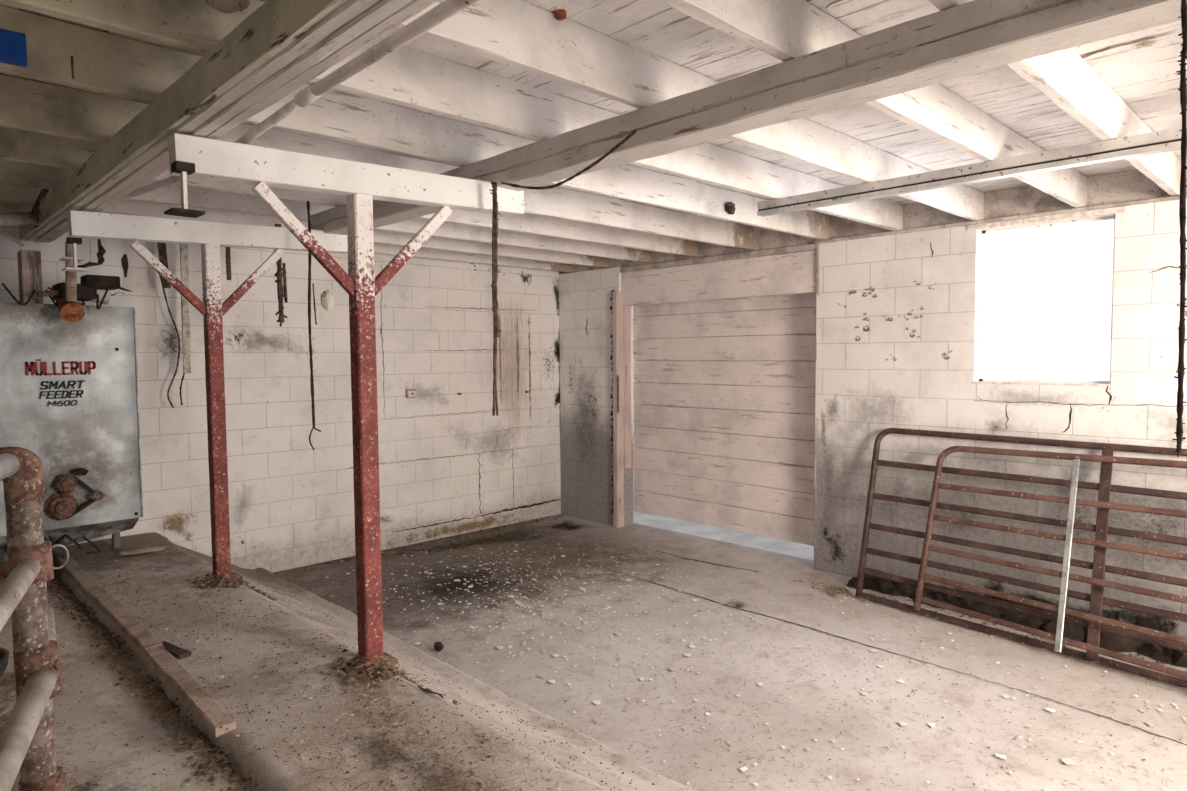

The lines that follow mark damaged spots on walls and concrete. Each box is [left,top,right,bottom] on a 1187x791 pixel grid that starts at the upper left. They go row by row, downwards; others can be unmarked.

water stain [224,327,277,347]
peeling [883,306,923,338]
crack [347,291,561,532]
water stain [517,318,599,455]
crack [974,386,1187,432]
crack [510,543,1187,745]
crack [418,686,446,698]